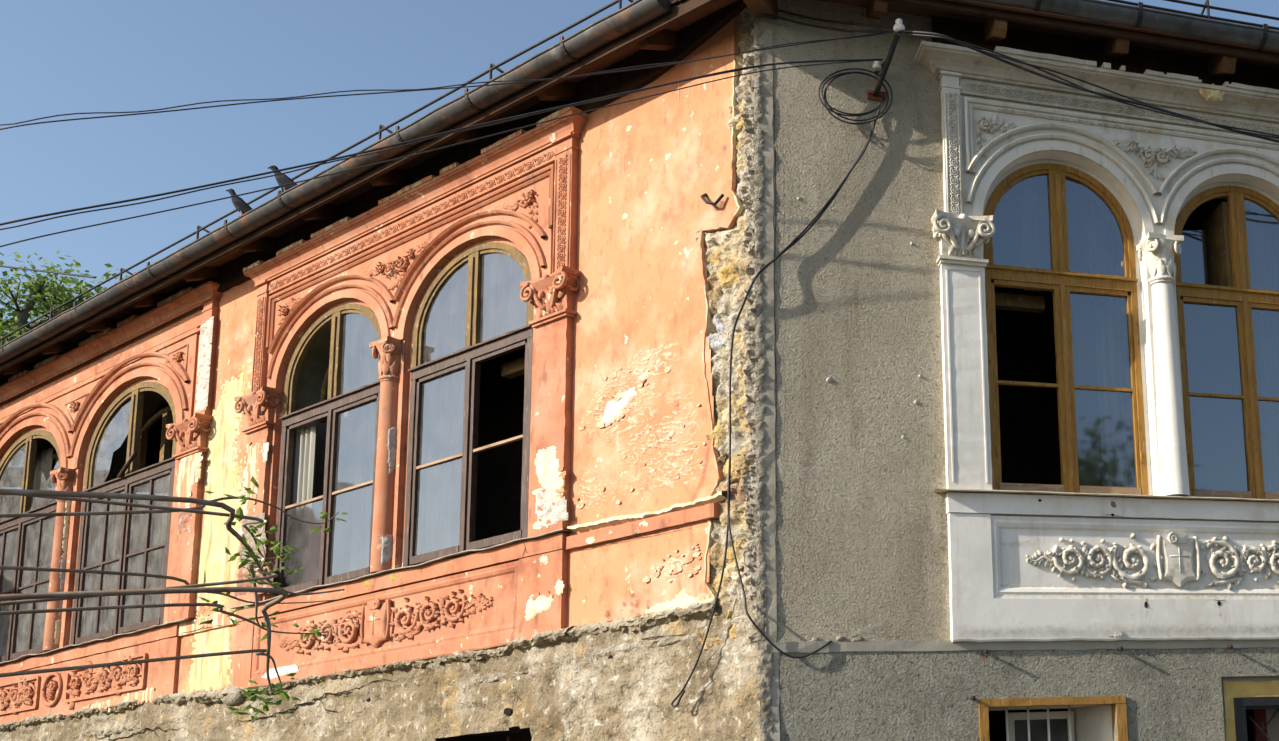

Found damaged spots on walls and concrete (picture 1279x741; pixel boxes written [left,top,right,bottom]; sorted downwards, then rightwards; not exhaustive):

flaking render [0,7,776,741]